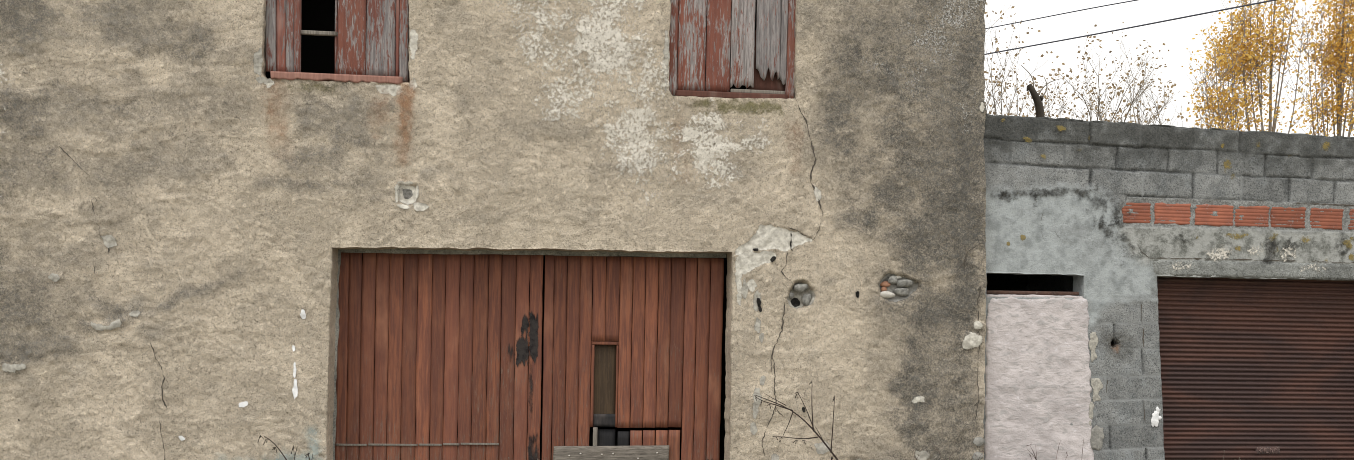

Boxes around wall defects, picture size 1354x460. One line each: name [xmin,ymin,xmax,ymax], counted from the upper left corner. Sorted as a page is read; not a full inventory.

water stain [496,0,771,206]
spalling [735,224,815,343]
crack [762,100,823,456]
water stain [829,0,1132,460]